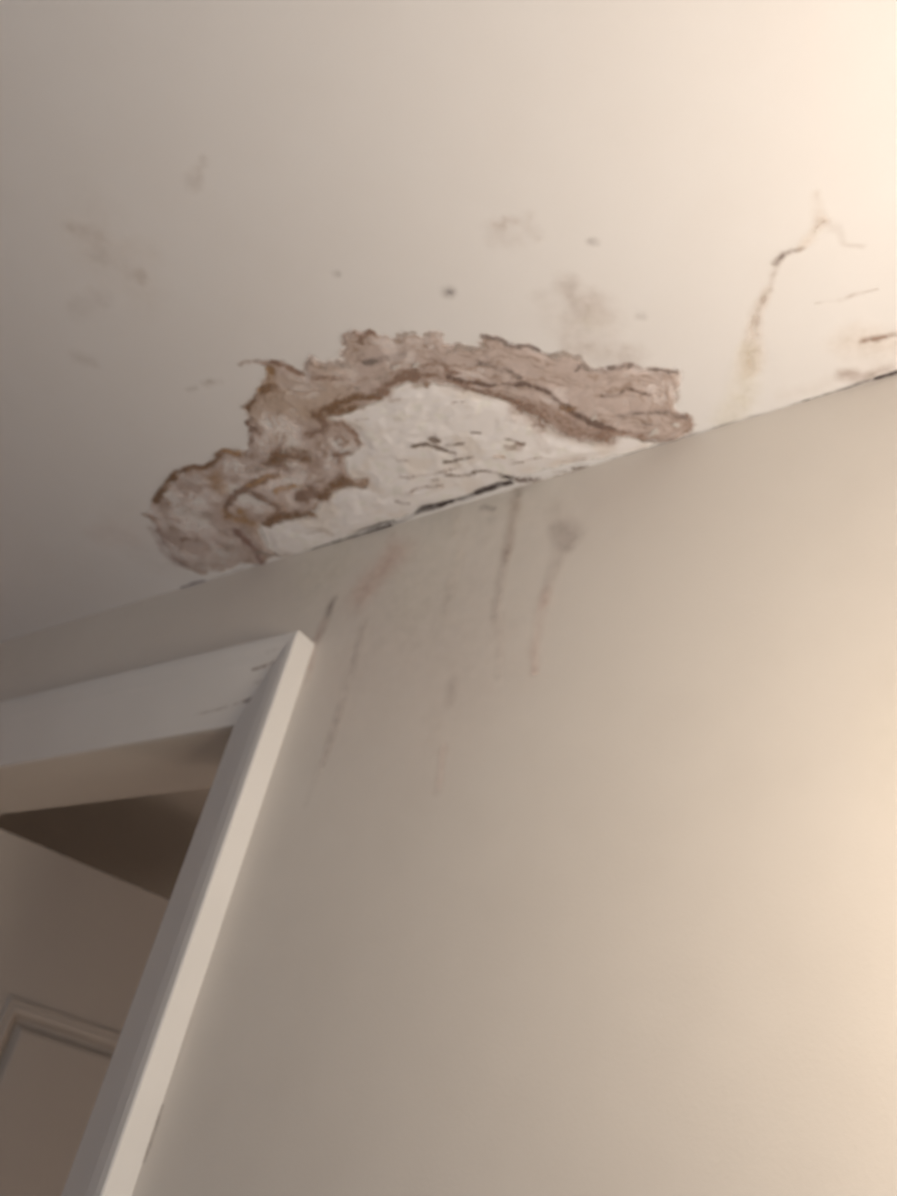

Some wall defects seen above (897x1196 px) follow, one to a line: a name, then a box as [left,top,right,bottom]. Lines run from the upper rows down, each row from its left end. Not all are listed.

peeling [143,329,692,574]